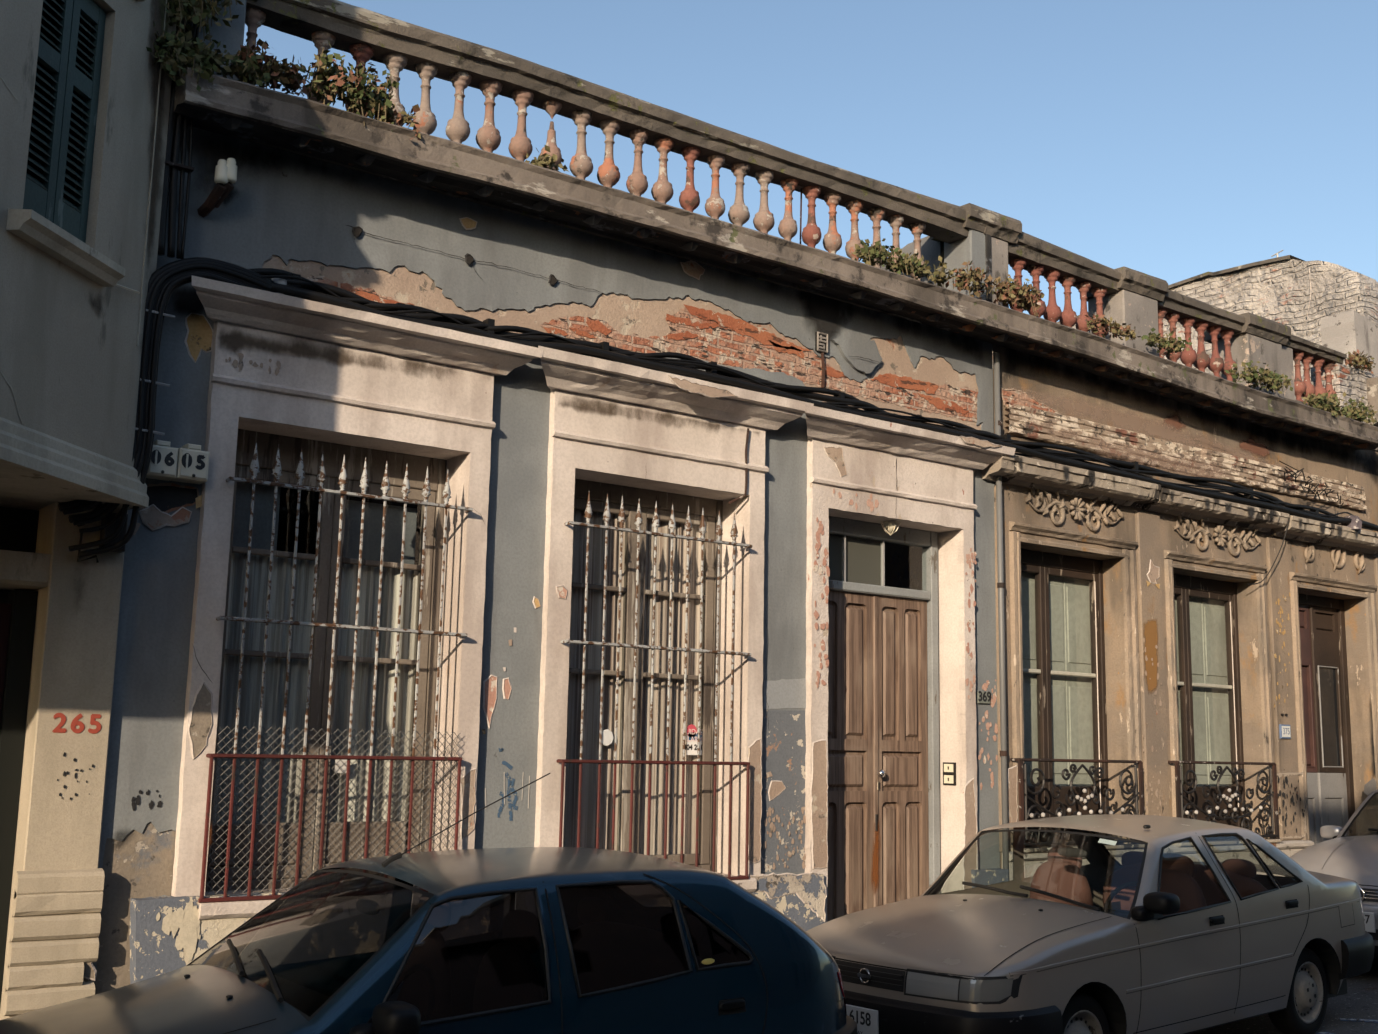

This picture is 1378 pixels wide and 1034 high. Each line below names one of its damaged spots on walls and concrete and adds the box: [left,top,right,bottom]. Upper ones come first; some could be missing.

flaking render [184,313,281,376]
flaking render [262,255,1270,461]
flaking render [133,483,202,536]
peeling [813,517,830,689]
flaking render [187,681,213,760]
peeling [482,667,512,734]
peeling [83,789,201,995]
flaking render [747,738,829,922]